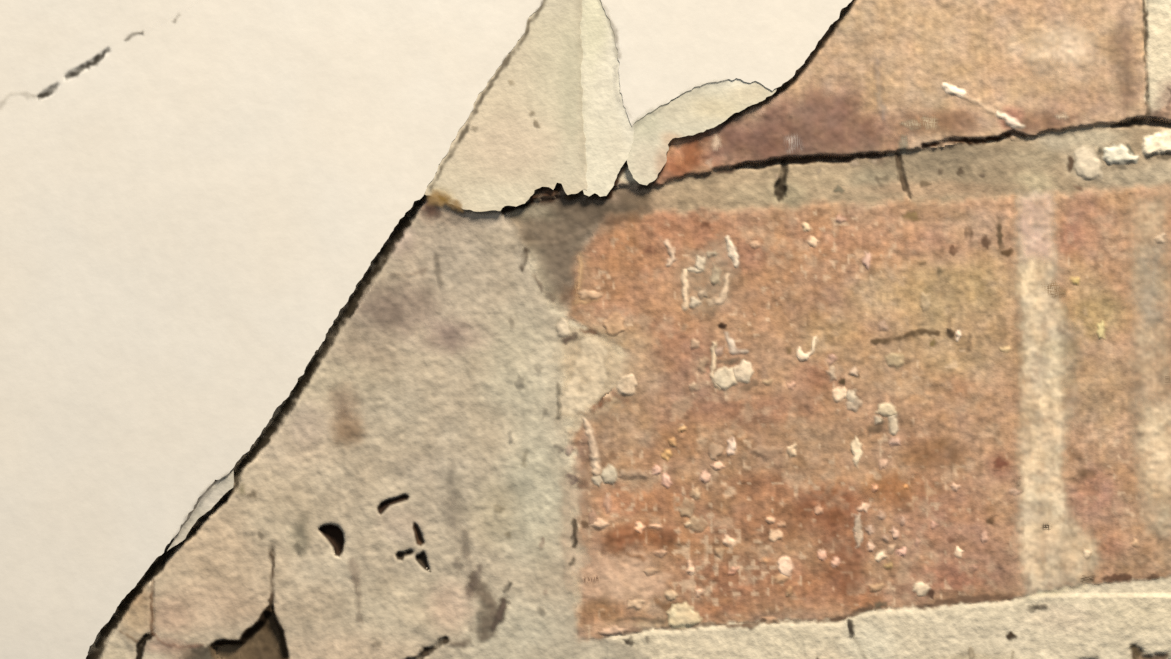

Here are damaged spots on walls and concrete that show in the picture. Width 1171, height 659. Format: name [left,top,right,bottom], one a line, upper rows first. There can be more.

crack [38,32,143,98]
spalling [424,0,777,212]
peeling [1074,131,1171,179]
crack [86,4,543,659]
crack [563,329,597,343]
peeling [690,323,772,390]
peeling [556,312,703,627]
flaking render [167,469,234,551]
spalling [378,495,409,514]
spalling [396,523,430,571]
crack [570,519,598,580]
spalling [210,605,289,659]